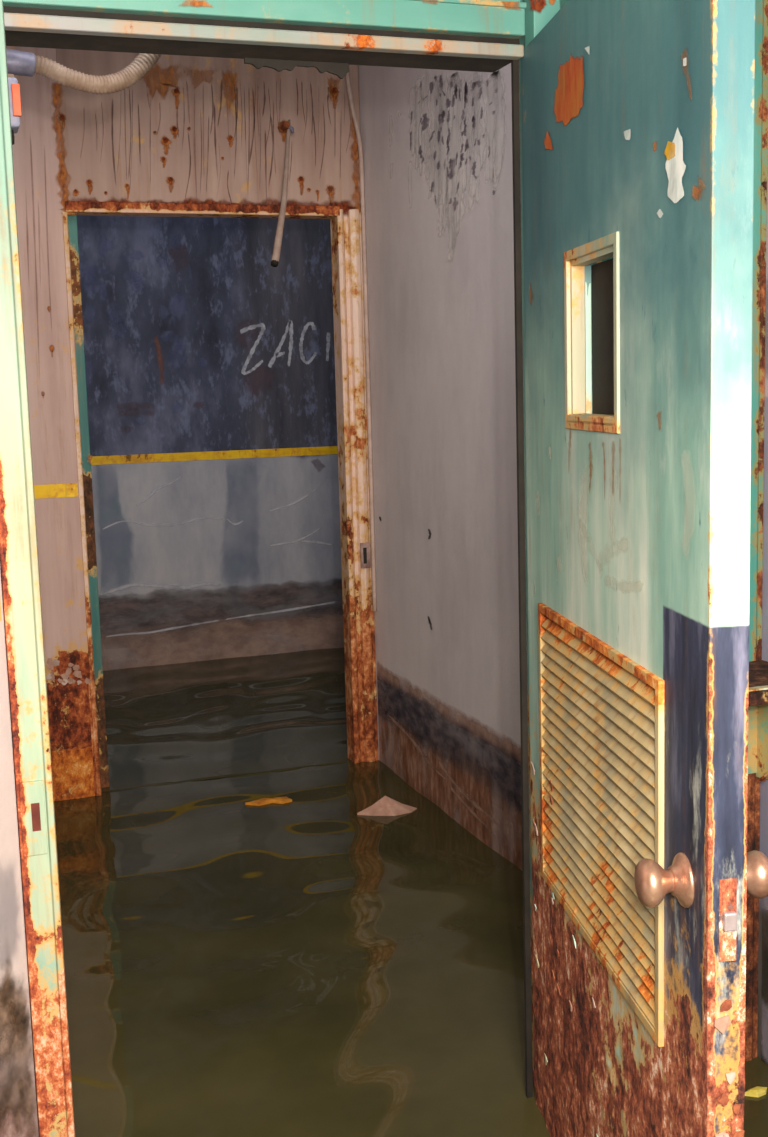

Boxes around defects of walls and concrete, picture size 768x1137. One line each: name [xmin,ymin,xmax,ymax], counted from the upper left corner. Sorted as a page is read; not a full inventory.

corrosion [52,83,129,215]
corrosion [143,65,180,109]
corrosion [146,119,361,215]
corrosion [328,79,339,104]
corrosion [544,54,584,150]
peeling [665,127,686,203]
damp [377,663,530,870]
damp [0,970,37,1137]